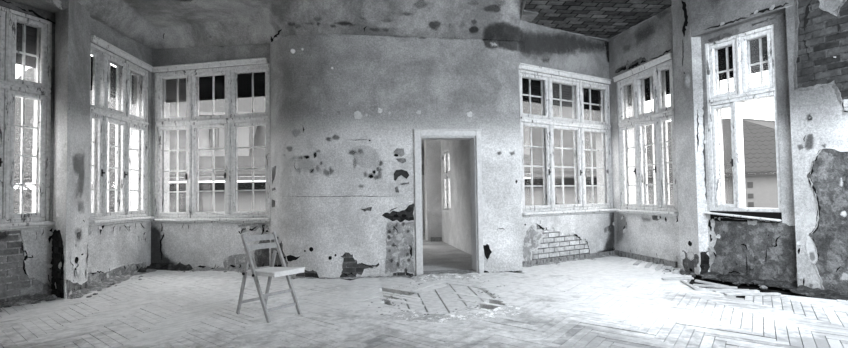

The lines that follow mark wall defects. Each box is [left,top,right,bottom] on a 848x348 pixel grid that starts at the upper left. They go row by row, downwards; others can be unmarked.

flaking render [523,0,672,40]
flaking render [707,28,740,43]
crack [681,0,788,66]
flaking render [751,0,848,112]
flaking render [287,147,333,175]
flaking render [392,147,410,193]
peeling [696,93,707,208]
flaking render [0,228,147,301]
flaking render [328,202,415,278]
flaking render [522,222,590,261]
flaking render [680,217,805,287]
flaking render [807,147,848,293]